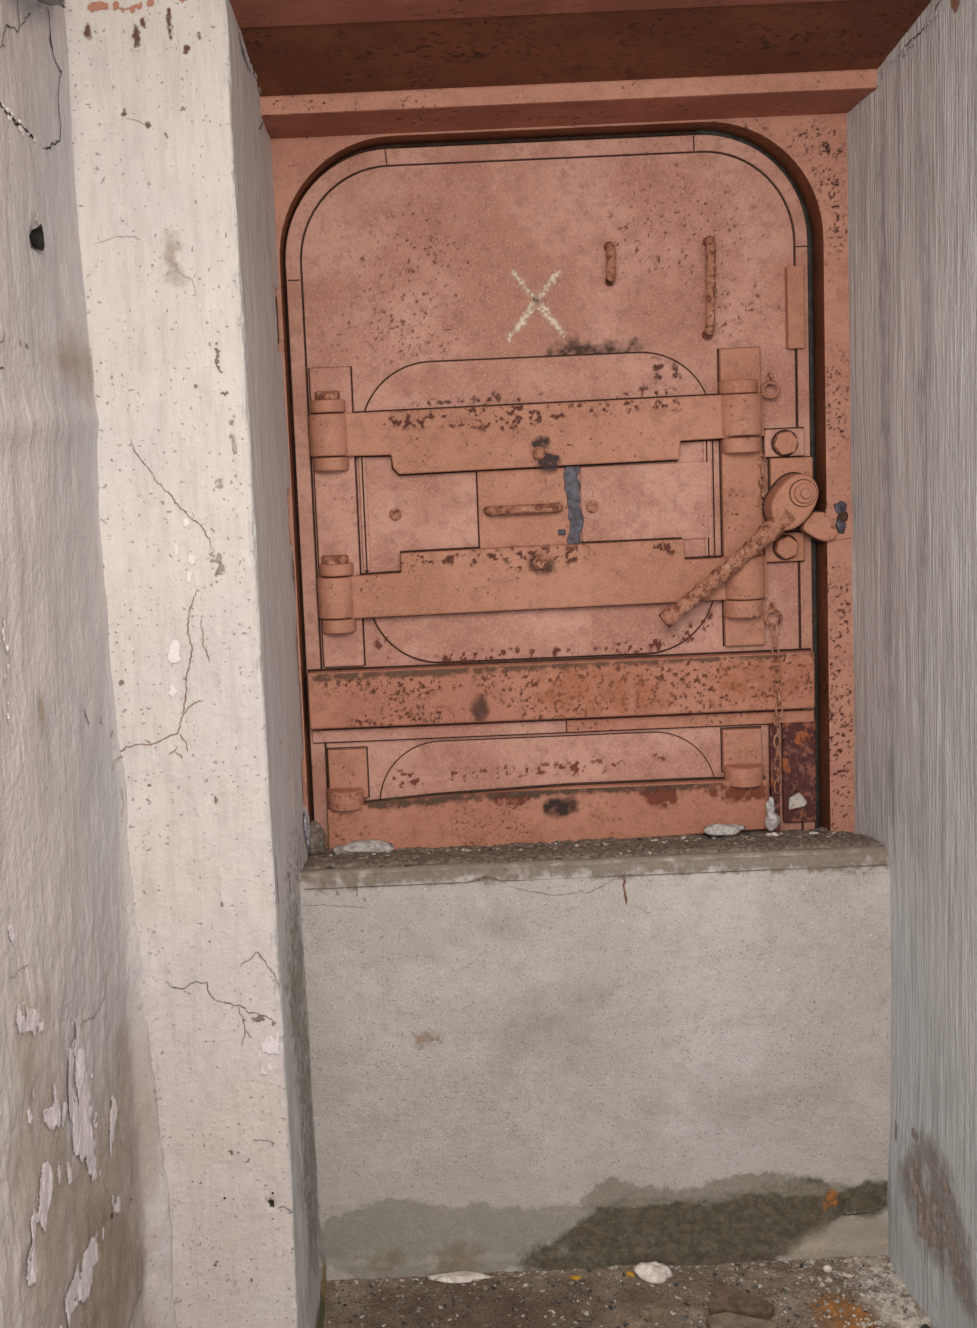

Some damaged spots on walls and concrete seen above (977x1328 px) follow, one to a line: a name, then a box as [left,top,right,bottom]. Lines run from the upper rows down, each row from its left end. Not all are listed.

crack [0,2,65,149]
crack [130,439,215,552]
crack [84,588,210,818]
rust [326,612,812,726]
rust [825,586,852,827]
rust [451,759,619,781]
rust [705,785,766,801]
peeling [16,1002,44,1037]
crack [165,981,277,1044]
leakage [285,840,846,1279]
peeling [27,1019,117,1286]
peeling [60,1228,104,1328]